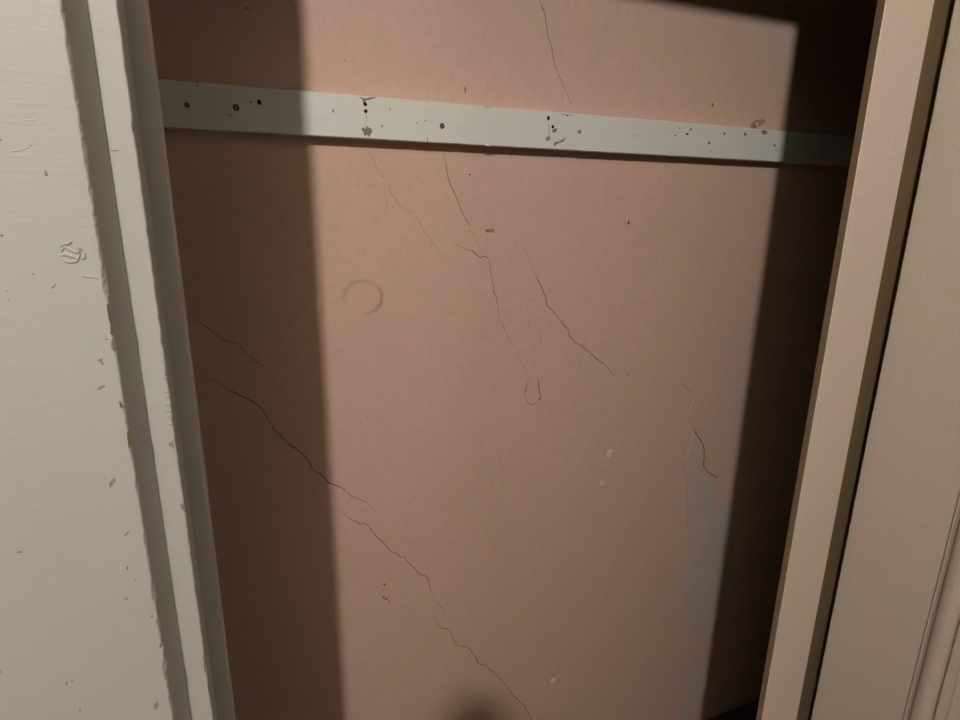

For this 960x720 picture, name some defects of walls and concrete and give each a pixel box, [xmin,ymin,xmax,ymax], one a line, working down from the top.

crack [365,148,541,406]
crack [524,249,627,375]
crack [204,375,531,719]
peeling [679,428,738,639]
peeling [679,656,708,720]